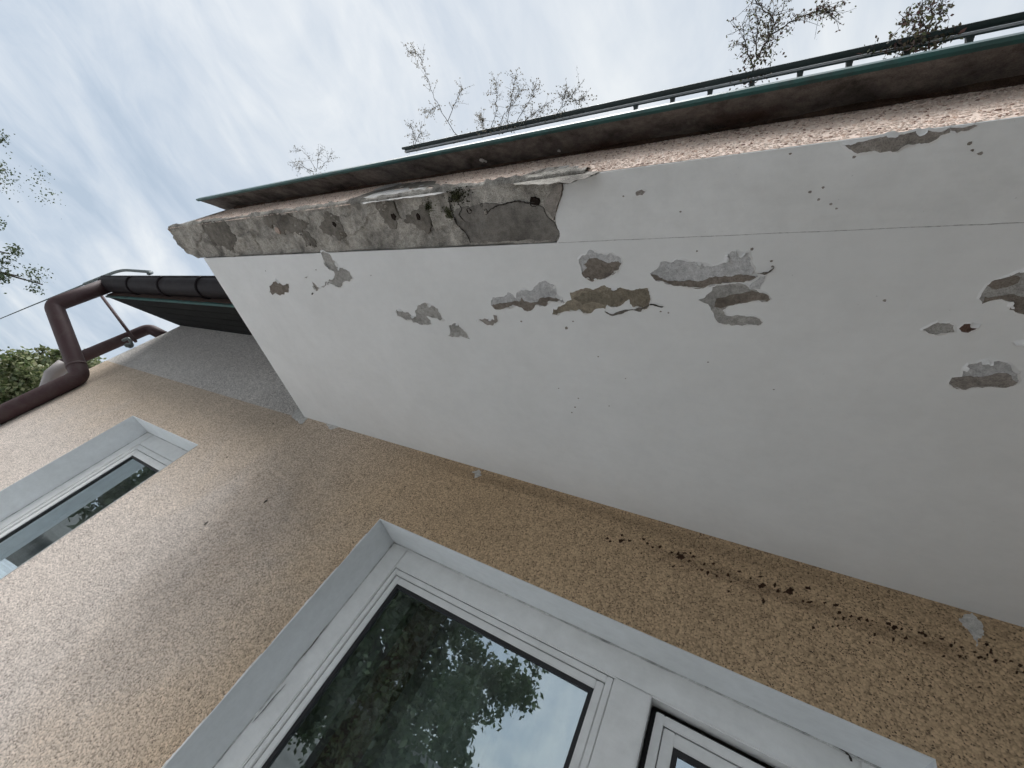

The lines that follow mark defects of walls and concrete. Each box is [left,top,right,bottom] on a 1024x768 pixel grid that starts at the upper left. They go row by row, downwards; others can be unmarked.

peeling [840,122,983,158]
spalling [168,165,600,296]
crack [448,198,535,243]
peeling [476,248,774,329]
peeling [976,268,1024,317]
peeling [396,301,470,339]
peeling [919,320,982,336]
peeling [946,359,1022,391]